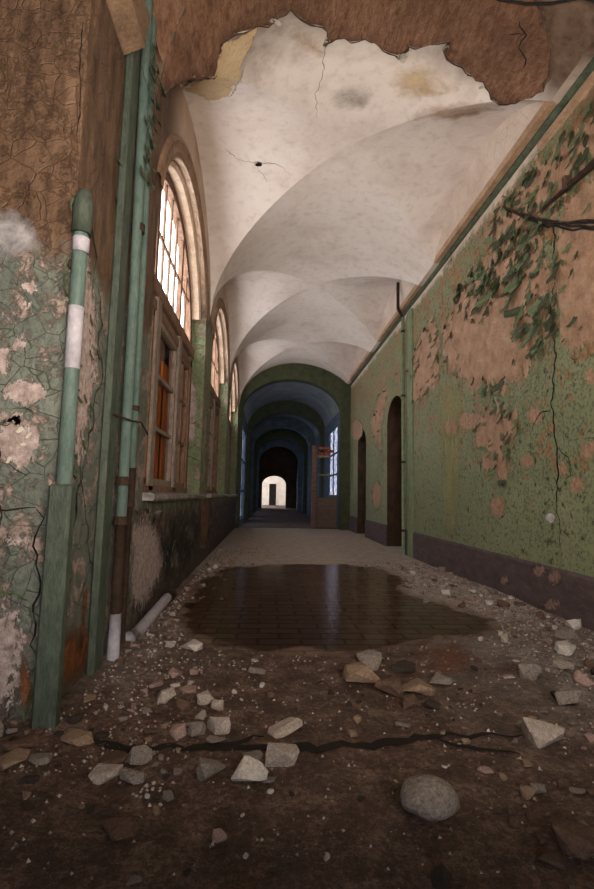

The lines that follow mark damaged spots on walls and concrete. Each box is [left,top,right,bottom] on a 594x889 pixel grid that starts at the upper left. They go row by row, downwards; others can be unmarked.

flaking render [140,0,553,190]
peeling [0,276,43,323]
peeling [0,331,52,473]
peeling [72,228,103,526]
peeling [351,99,594,518]
crack [532,227,571,568]
peeling [4,531,32,552]
crack [0,506,44,653]
flaking render [0,587,37,719]
crack [93,735,268,752]
crack [292,731,522,754]